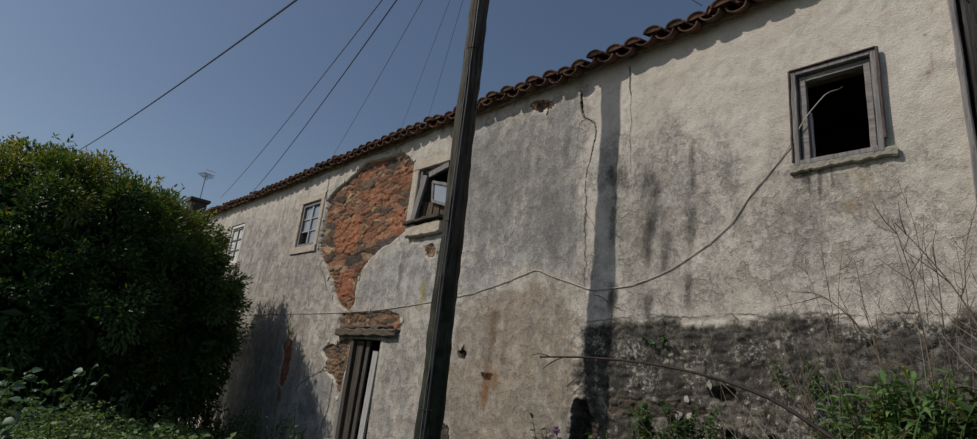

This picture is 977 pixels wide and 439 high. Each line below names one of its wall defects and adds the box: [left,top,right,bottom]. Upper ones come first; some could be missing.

peeling [530,99,555,115]
crack [577,93,977,344]
flaking render [425,243,438,257]
flaking render [317,149,416,401]
hole [707,380,736,401]